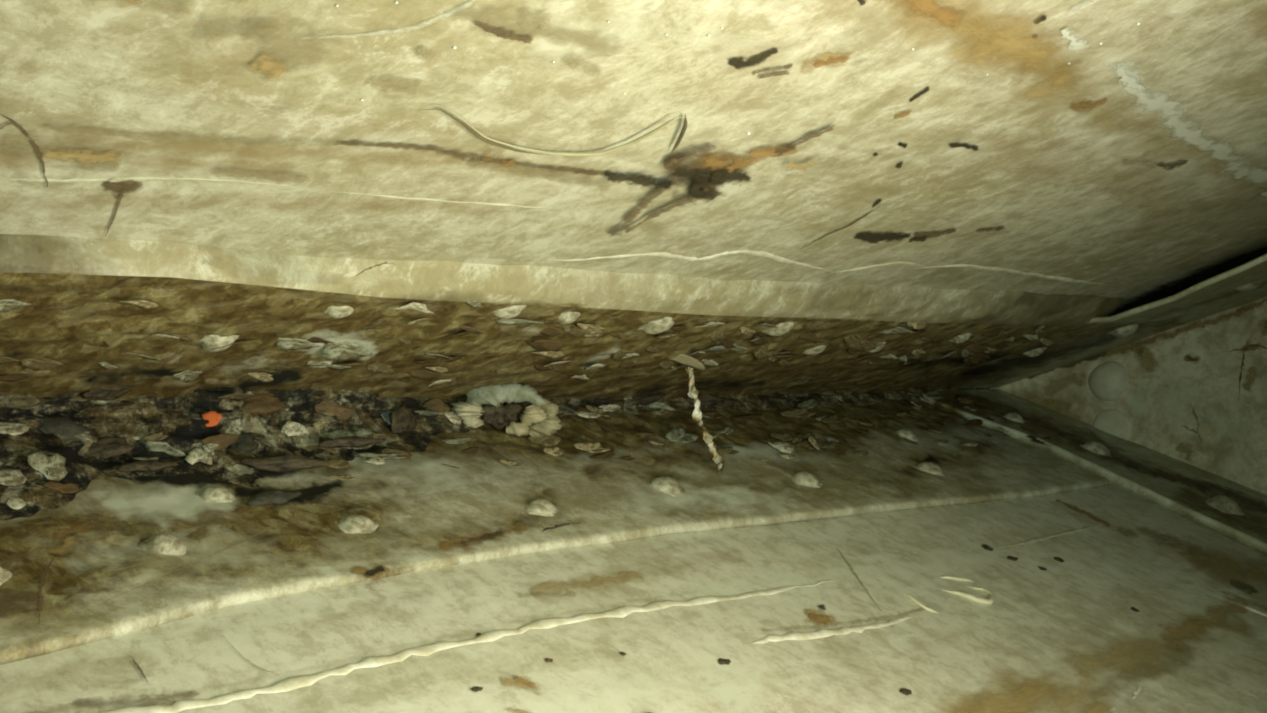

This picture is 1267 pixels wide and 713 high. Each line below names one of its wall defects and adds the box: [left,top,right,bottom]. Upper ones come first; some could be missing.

corrosion [804,53,850,68]
corrosion [898,0,1070,98]
corrosion [1071,99,1106,111]
corrosion [337,126,834,236]
crack [1107,247,1267,317]
damp [955,528,1266,713]
crack [130,655,147,681]